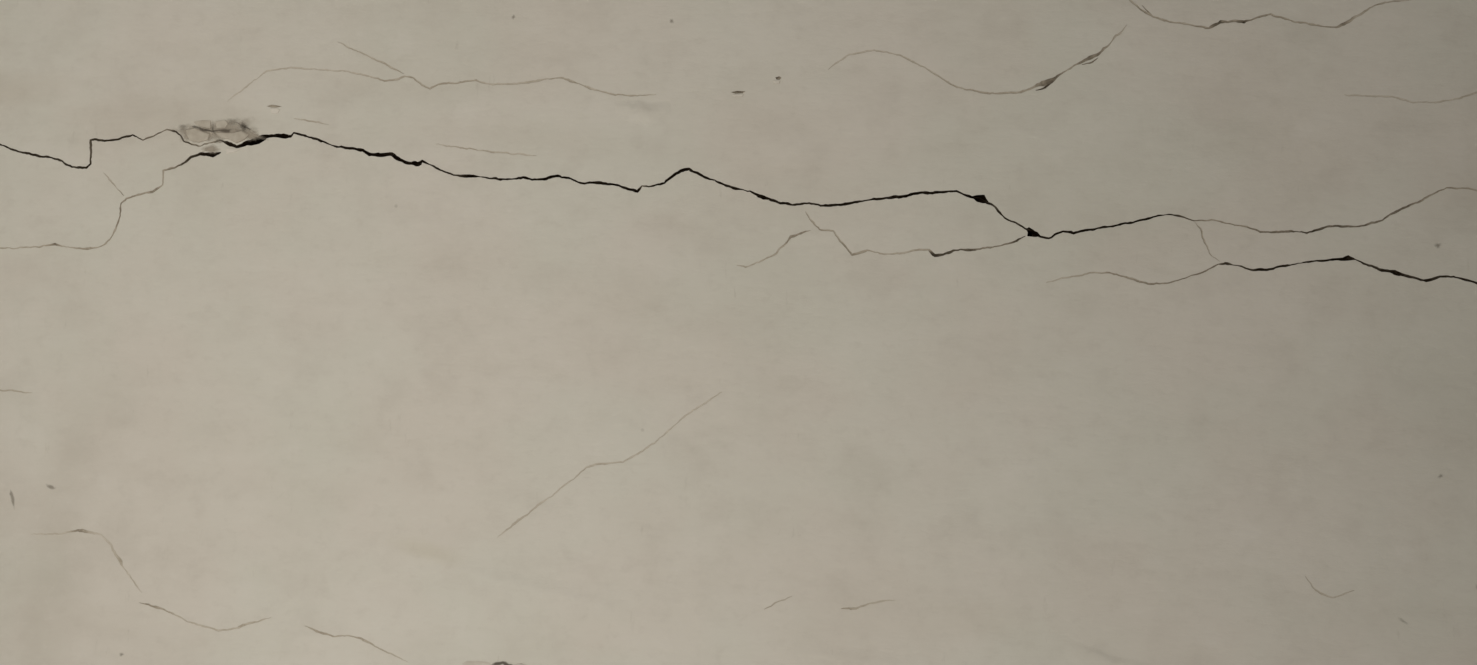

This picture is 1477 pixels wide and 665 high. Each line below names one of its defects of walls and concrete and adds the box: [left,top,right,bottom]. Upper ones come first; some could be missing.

crack [828,0,1409,94]
crack [1344,92,1477,103]
crack [0,118,1477,285]
crack [498,392,721,537]
crack [841,600,894,610]